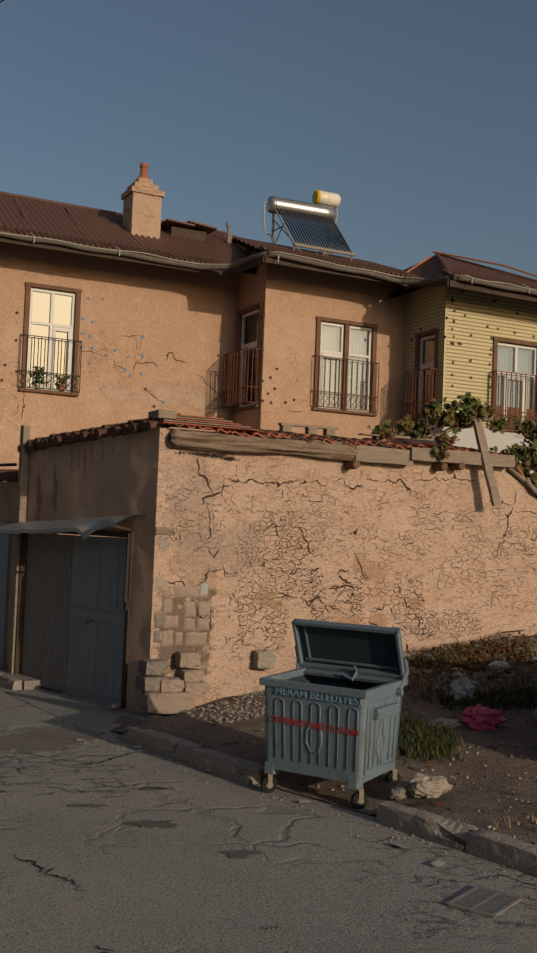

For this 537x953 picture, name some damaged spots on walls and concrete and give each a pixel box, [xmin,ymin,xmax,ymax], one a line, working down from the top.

crack [0,361,25,430]
crack [166,458,537,653]
spalling [153,582,216,674]
crack [9,853,83,891]
crack [336,837,537,935]